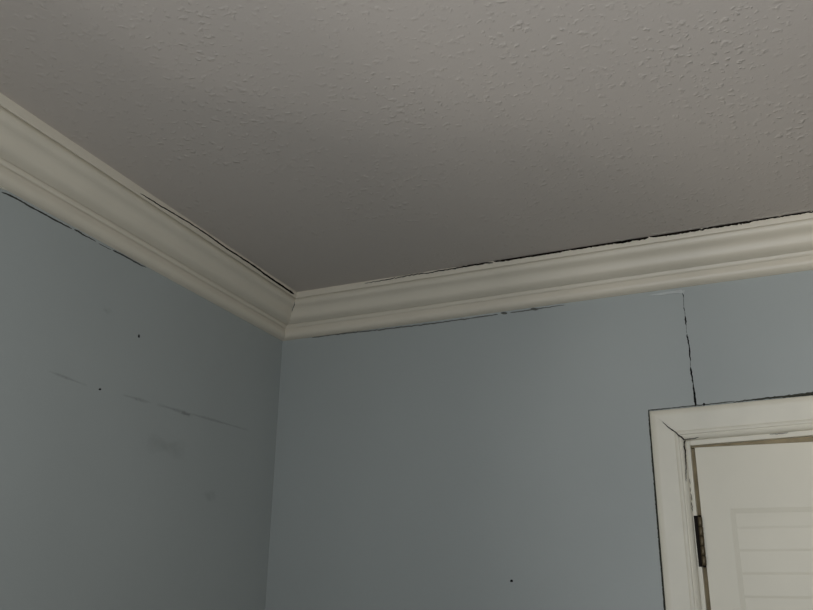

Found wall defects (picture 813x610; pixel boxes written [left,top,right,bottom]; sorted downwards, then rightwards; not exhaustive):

crack [2,192,145,267]
crack [140,193,295,310]
crack [369,209,813,283]
crack [648,293,813,610]